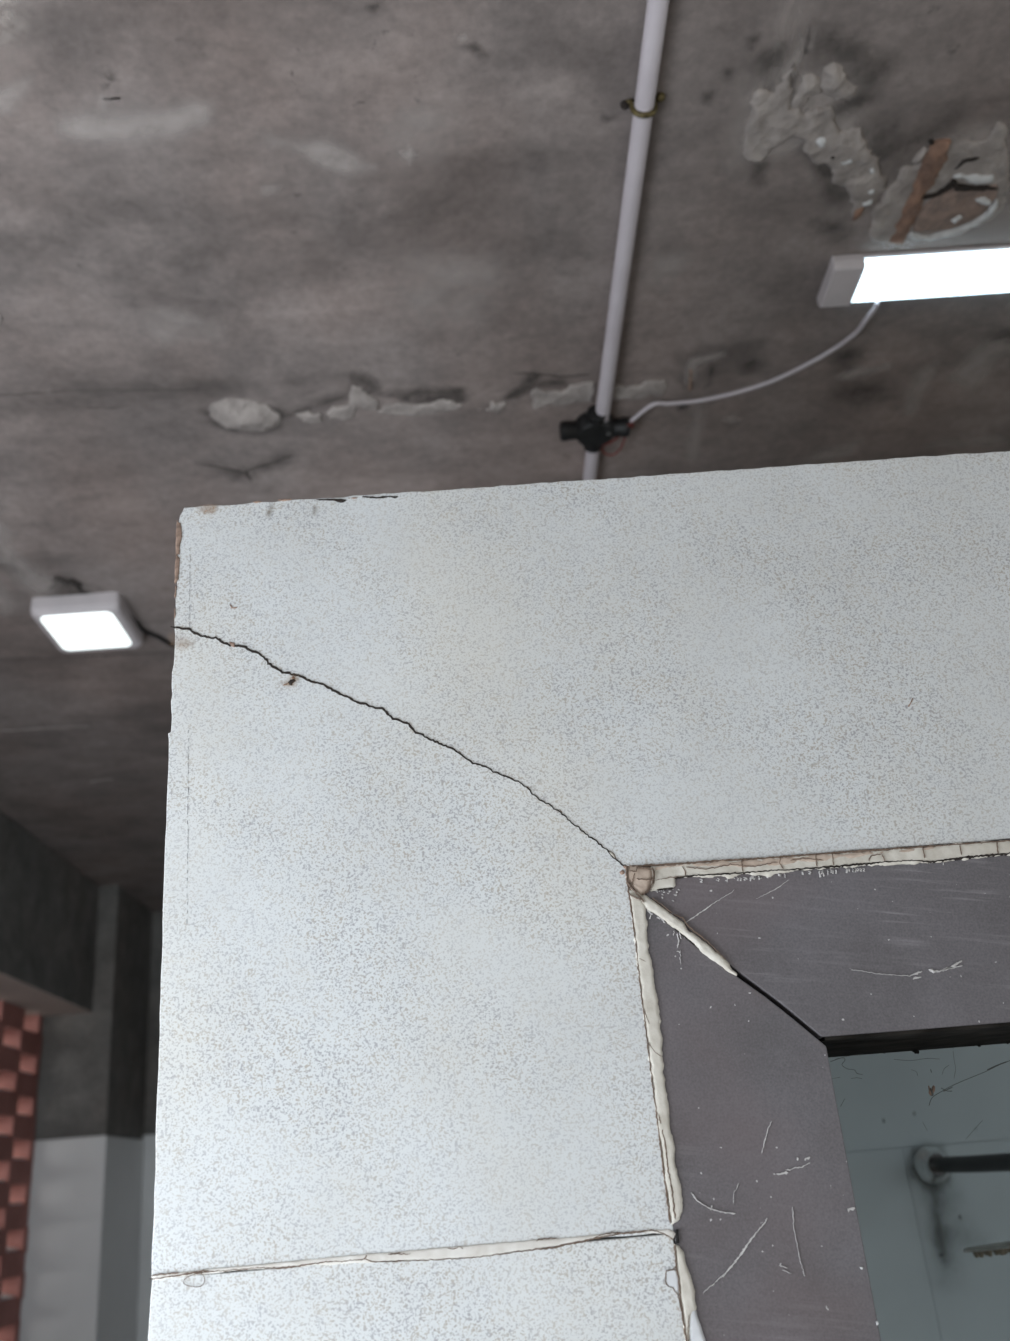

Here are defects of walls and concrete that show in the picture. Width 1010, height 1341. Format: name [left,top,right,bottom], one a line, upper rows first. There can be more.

spalling [743,61,1010,245]
flaking render [295,374,596,424]
flaking render [611,379,667,402]
crack [0,626,1010,1341]